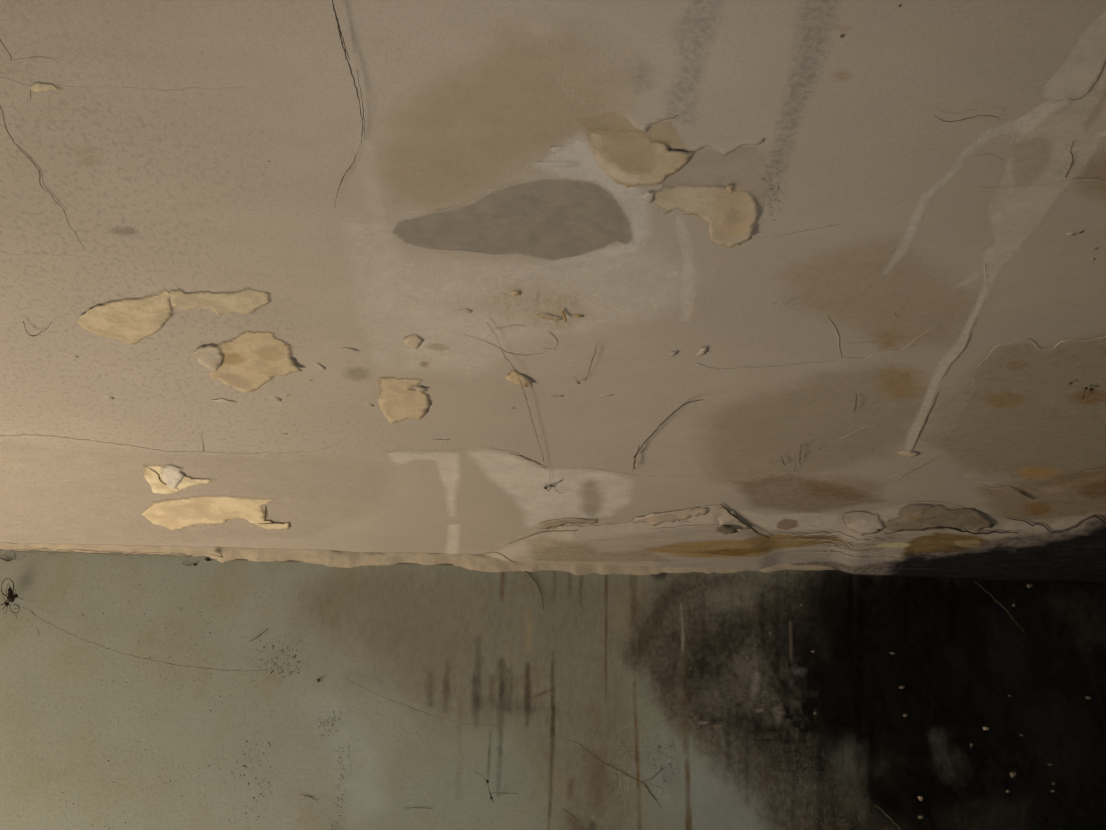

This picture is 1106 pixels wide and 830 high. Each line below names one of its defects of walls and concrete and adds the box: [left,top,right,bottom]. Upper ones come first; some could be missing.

crack [0,105,86,250]
flaking render [393,113,771,260]
peeling [76,289,270,346]
peeling [193,332,303,403]
peeling [378,377,430,424]
peeling [141,465,289,530]
leakage [320,467,1106,830]